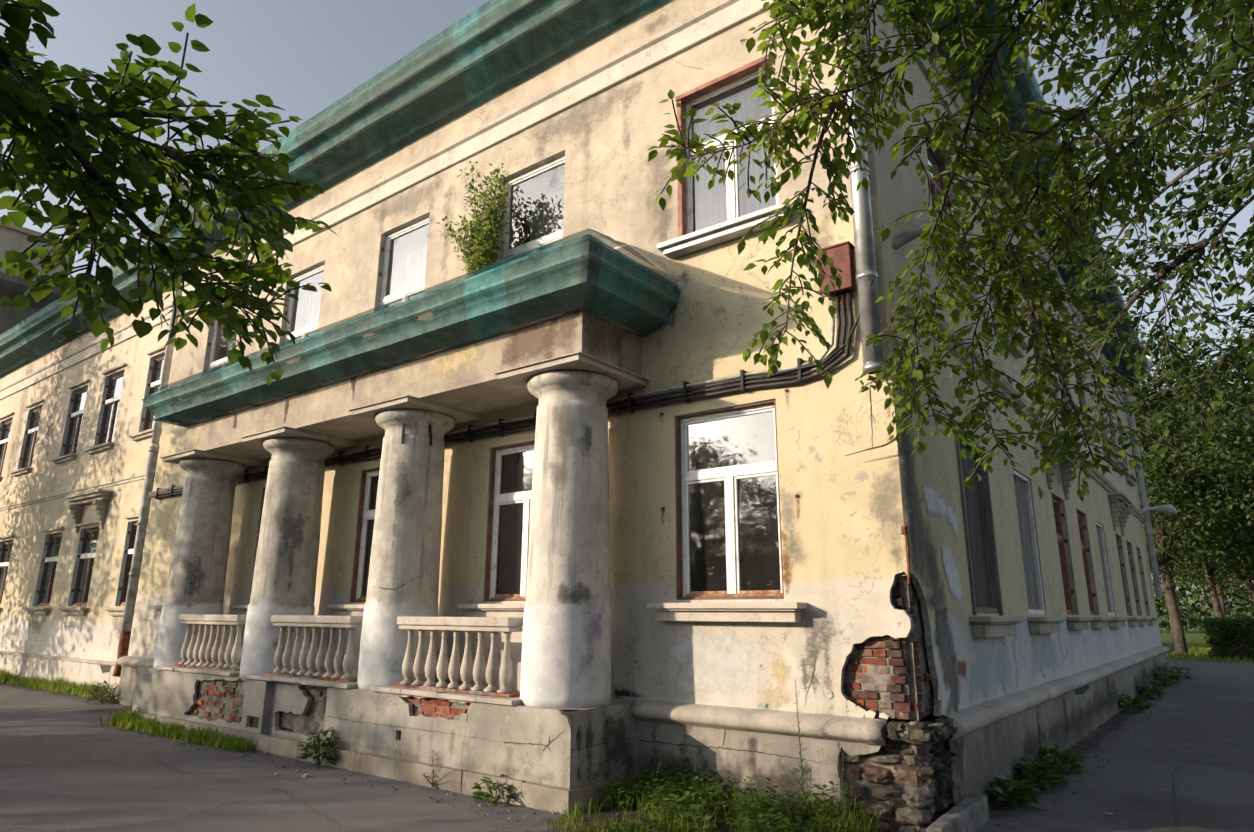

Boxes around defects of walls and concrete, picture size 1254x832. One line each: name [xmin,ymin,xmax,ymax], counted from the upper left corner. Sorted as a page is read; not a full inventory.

water stain [275,512,304,587]
water stain [877,387,959,712]
water stain [802,618,835,690]
spalling [187,680,244,723]
spalling [279,686,328,735]
spalling [404,696,471,722]
crack [327,716,829,770]
water stain [577,718,809,813]
spalling [823,572,958,832]